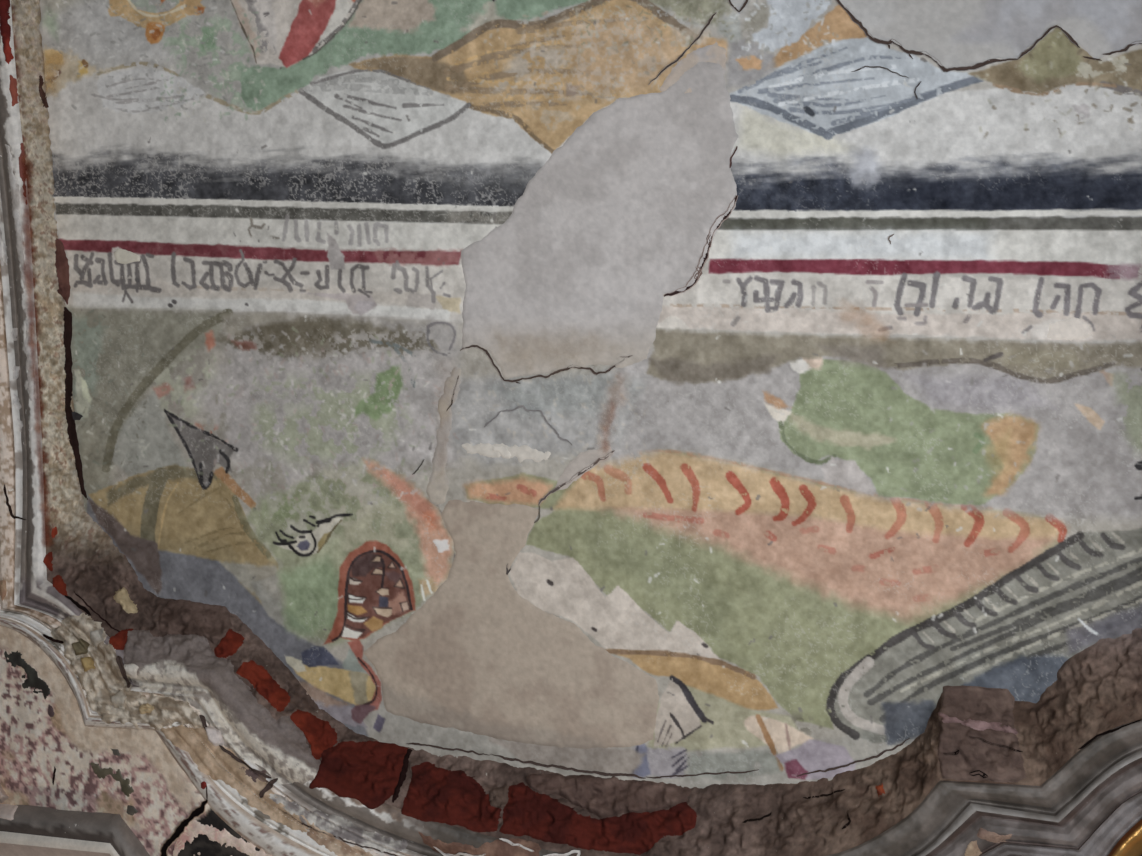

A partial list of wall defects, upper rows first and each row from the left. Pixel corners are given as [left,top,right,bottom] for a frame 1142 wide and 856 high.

peeling [9,75,19,106]
spalling [39,68,59,108]
peeling [0,143,27,289]
peeling [11,320,36,434]
spalling [55,238,88,500]
flaking render [43,552,68,596]
spalling [113,587,138,614]
spalling [43,613,408,856]
flaking render [214,629,697,856]
crack [160,785,208,856]